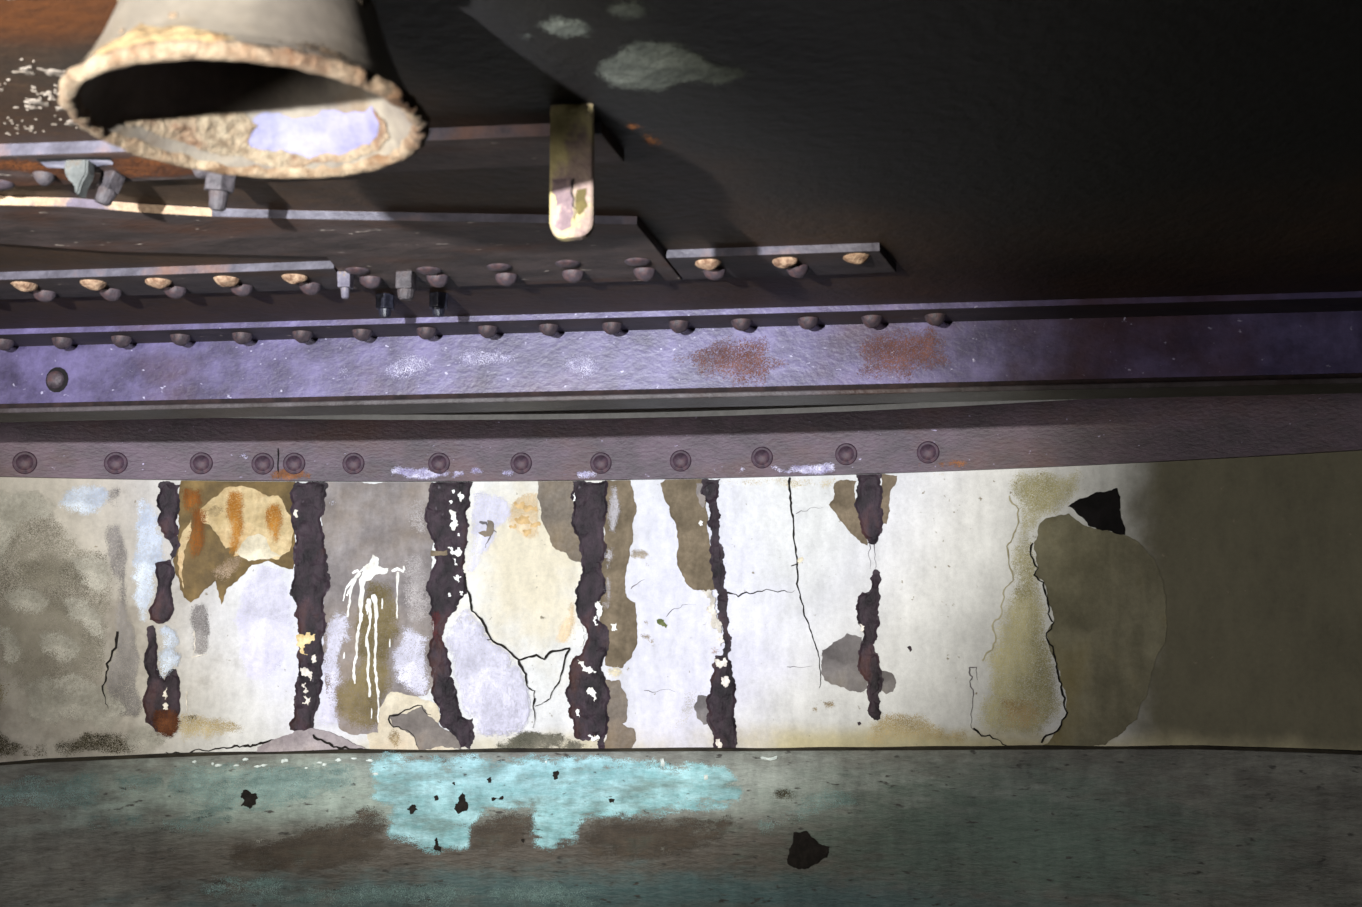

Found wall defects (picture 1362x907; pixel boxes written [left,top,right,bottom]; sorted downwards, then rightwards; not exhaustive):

corrosion [173,469,311,604]
peeling [113,479,744,907]
crack [463,573,570,726]
crack [727,477,823,688]
spalling [821,474,897,725]
flaking render [1030,488,1167,746]